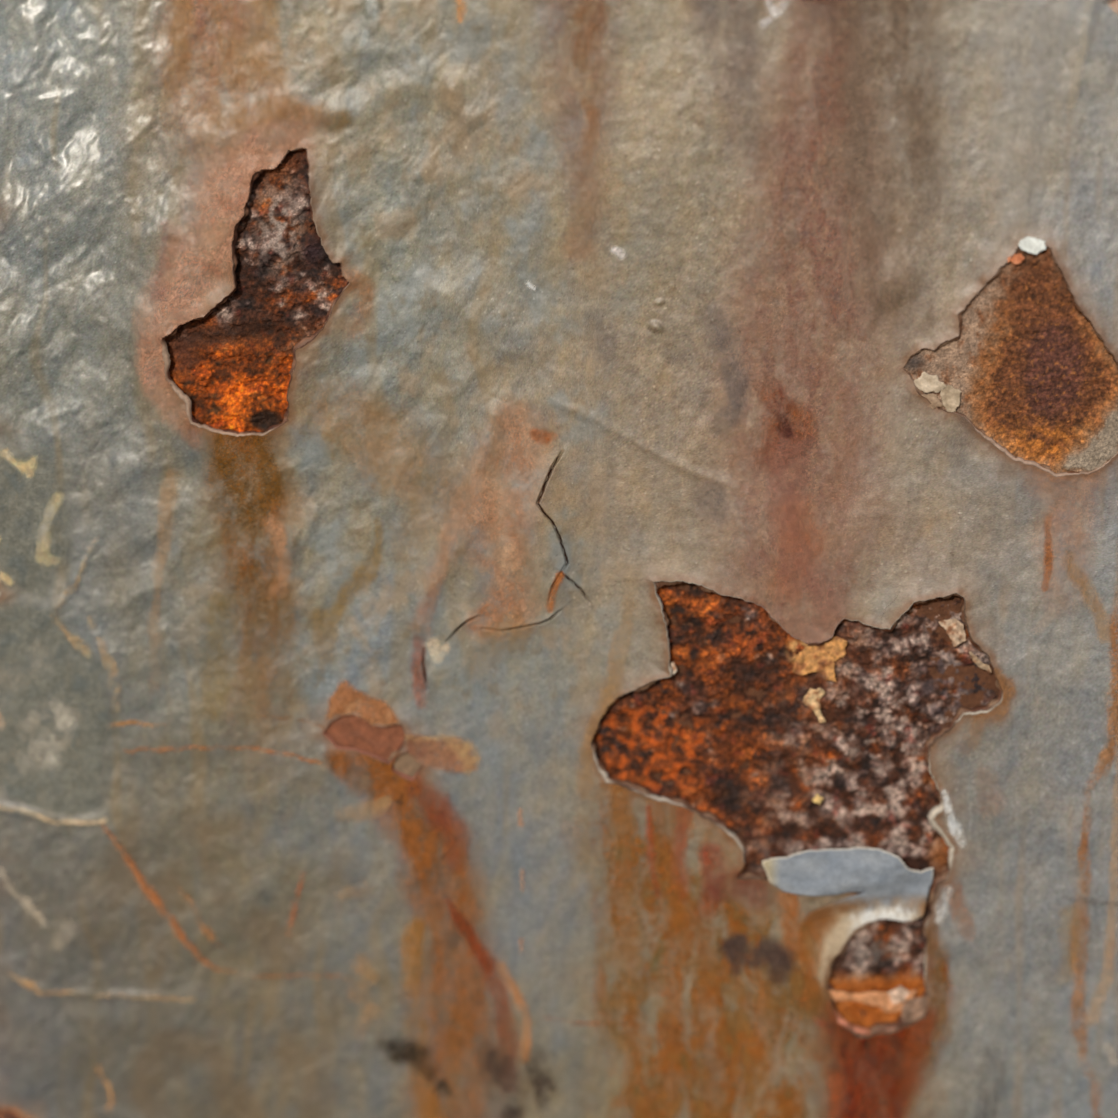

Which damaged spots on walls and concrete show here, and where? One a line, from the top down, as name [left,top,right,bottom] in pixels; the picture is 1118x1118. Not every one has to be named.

peeling [160,147,351,437]
peeling [902,236,1118,477]
crack [495,458,588,630]
peeling [322,682,478,781]
corrosion [328,753,522,1082]
peeling [590,580,1003,1038]
corrosion [811,943,948,1118]